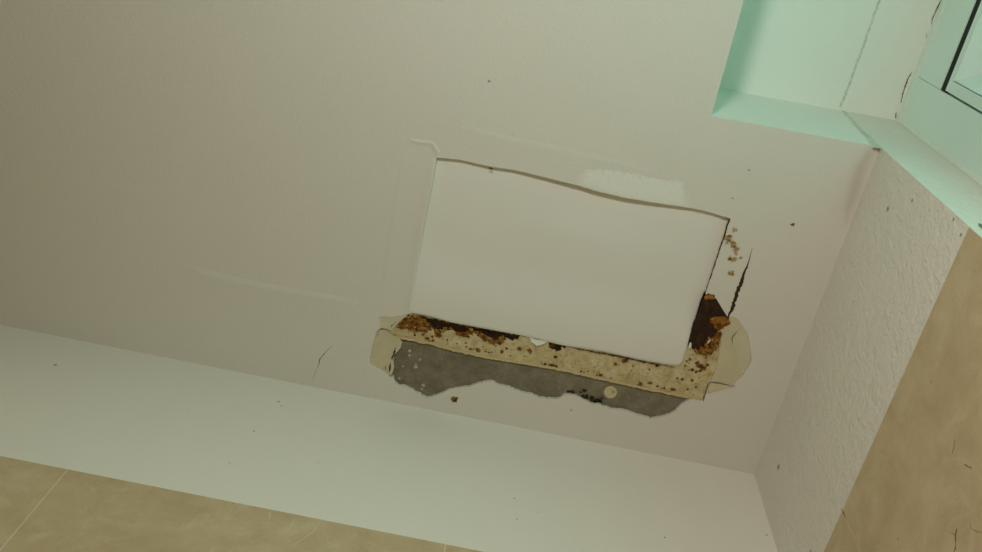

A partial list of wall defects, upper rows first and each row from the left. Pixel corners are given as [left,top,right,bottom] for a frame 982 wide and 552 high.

crack [705,218,730,294]
crack [727,250,752,319]
corrosion [395,314,532,357]
flaking render [370,313,688,417]
corrosion [543,342,566,368]
corrosion [637,294,730,391]
peeling [703,317,751,401]
crack [948,524,982,552]